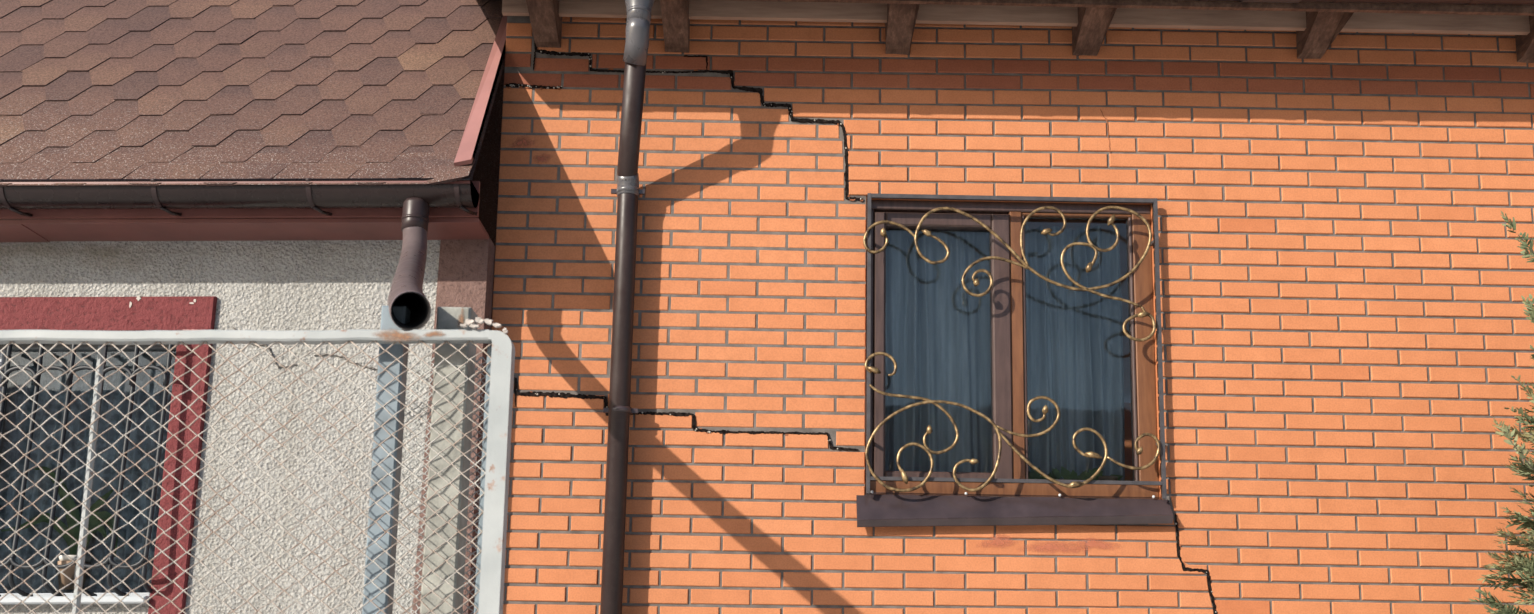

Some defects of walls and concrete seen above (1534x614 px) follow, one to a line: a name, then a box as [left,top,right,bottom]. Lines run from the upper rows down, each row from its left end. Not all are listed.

crack [505,41,863,202]
crack [233,327,432,383]
crack [513,377,858,451]
crack [1175,514,1218,614]